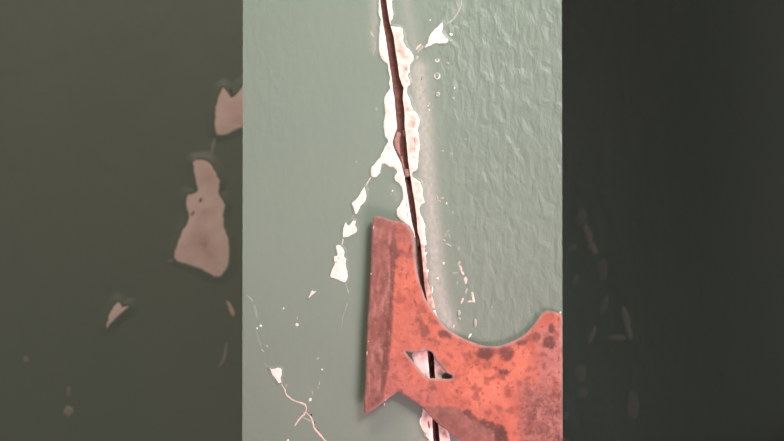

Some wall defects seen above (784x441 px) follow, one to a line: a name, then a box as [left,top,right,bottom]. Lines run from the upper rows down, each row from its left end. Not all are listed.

peeling [328,0,462,321]
crack [380,0,427,300]
peeling [410,350,447,379]
crack [427,350,435,378]
peeling [417,406,454,441]
crack [432,418,440,441]